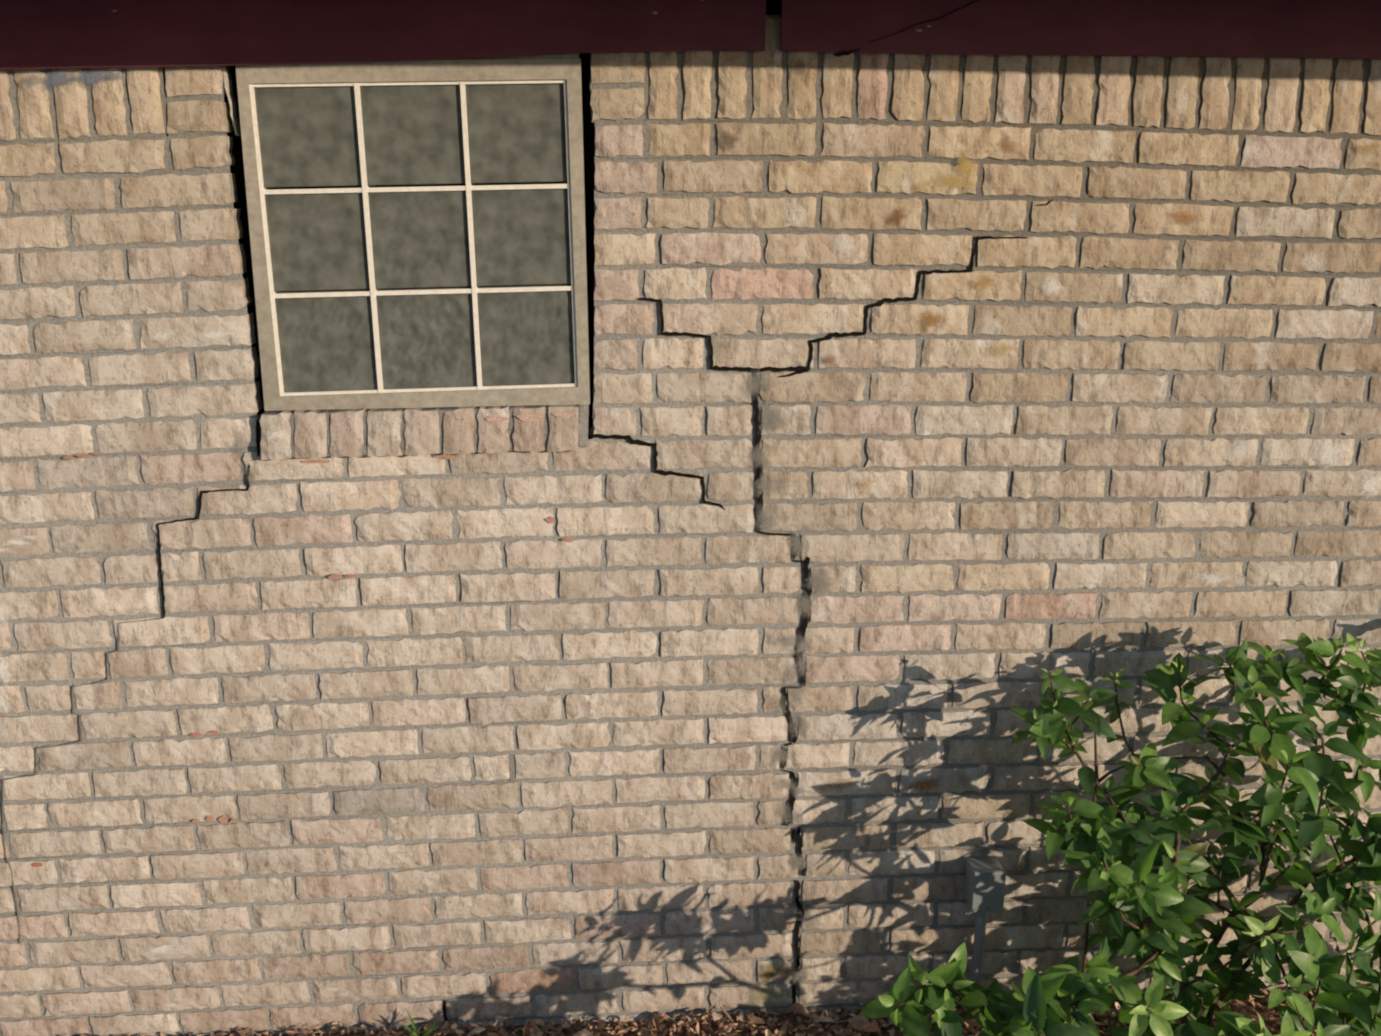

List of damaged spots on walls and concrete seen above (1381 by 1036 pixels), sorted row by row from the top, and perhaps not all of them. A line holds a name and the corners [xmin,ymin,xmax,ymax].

crack [2,420,260,945]
crack [589,199,1053,1004]